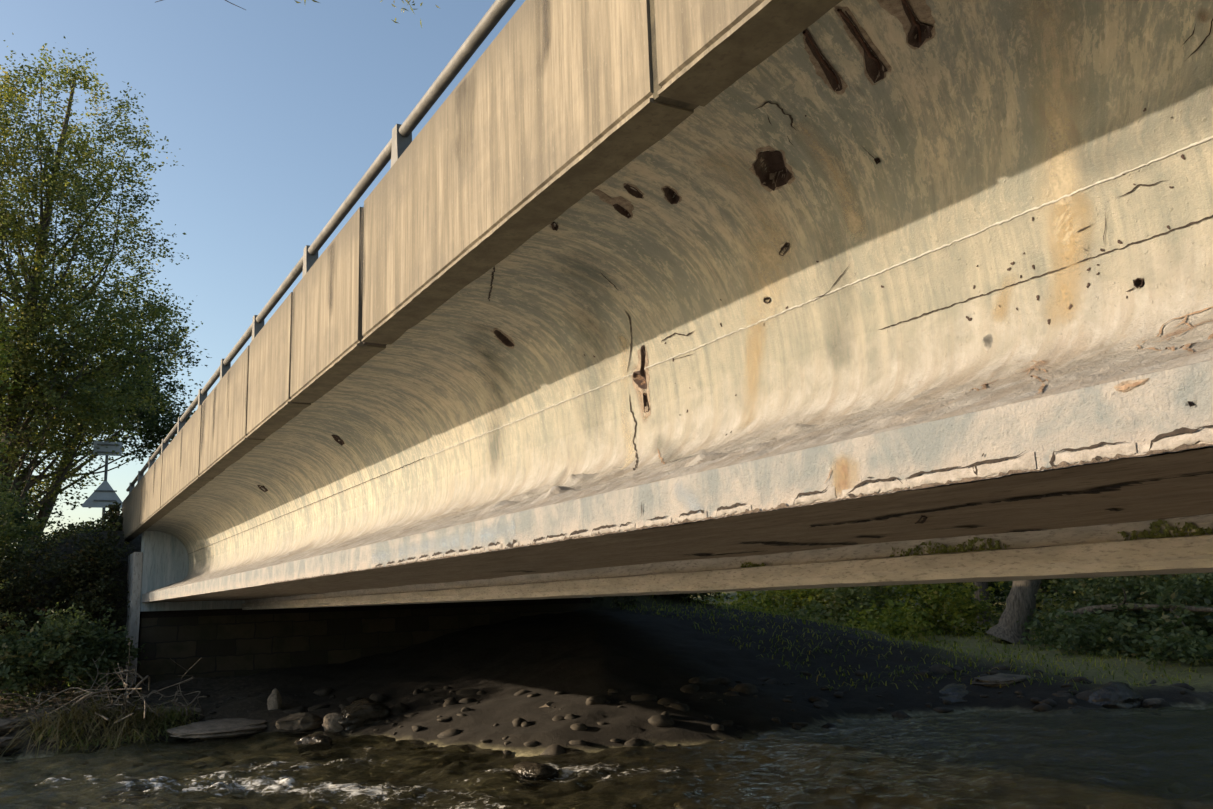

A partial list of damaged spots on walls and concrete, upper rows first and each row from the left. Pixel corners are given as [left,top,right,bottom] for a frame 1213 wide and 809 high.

spalling [803,29,848,95]
spalling [834,6,892,86]
spalling [877,0,936,50]
crack [1184,19,1213,59]
hole [749,145,795,192]
crack [1075,180,1167,251]
crack [1136,306,1213,352]
rust [629,345,651,470]